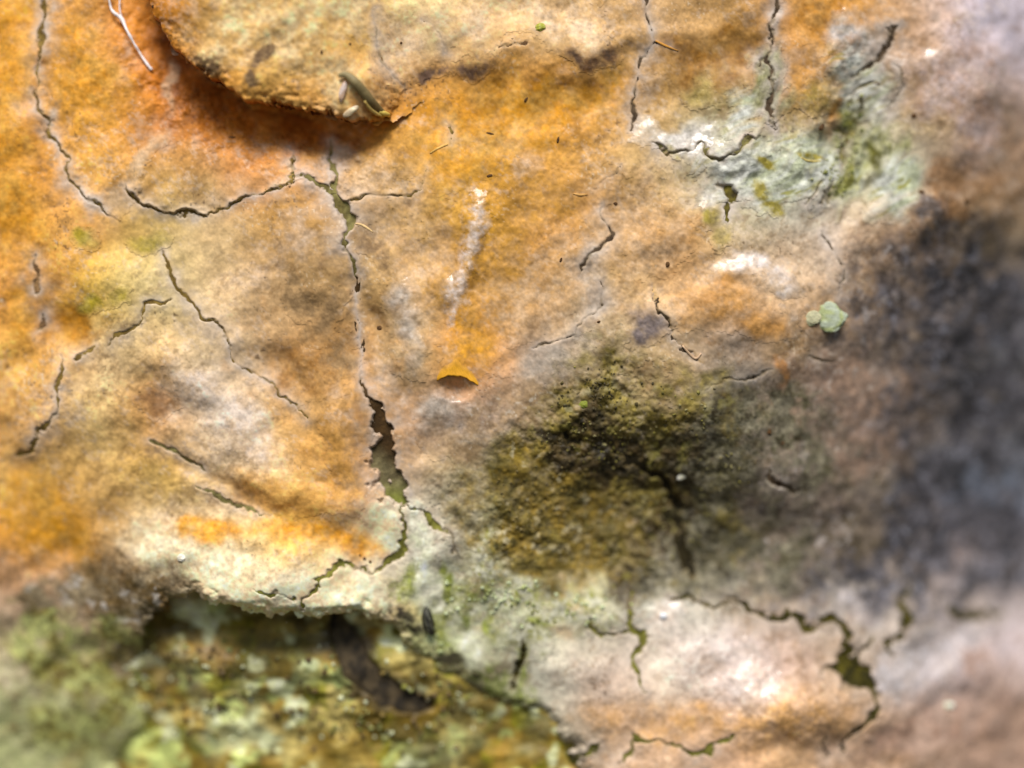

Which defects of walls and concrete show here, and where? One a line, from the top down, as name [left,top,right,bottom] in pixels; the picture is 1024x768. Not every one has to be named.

crack [630,0,658,131]
crack [656,0,780,161]
crack [833,26,898,161]
crack [126,141,367,276]
crack [16,253,308,457]
leakage [399,0,1024,655]
crack [149,439,262,516]
crack [255,505,453,608]
crack [588,591,647,693]
crack [670,587,914,757]
crack [622,733,735,762]